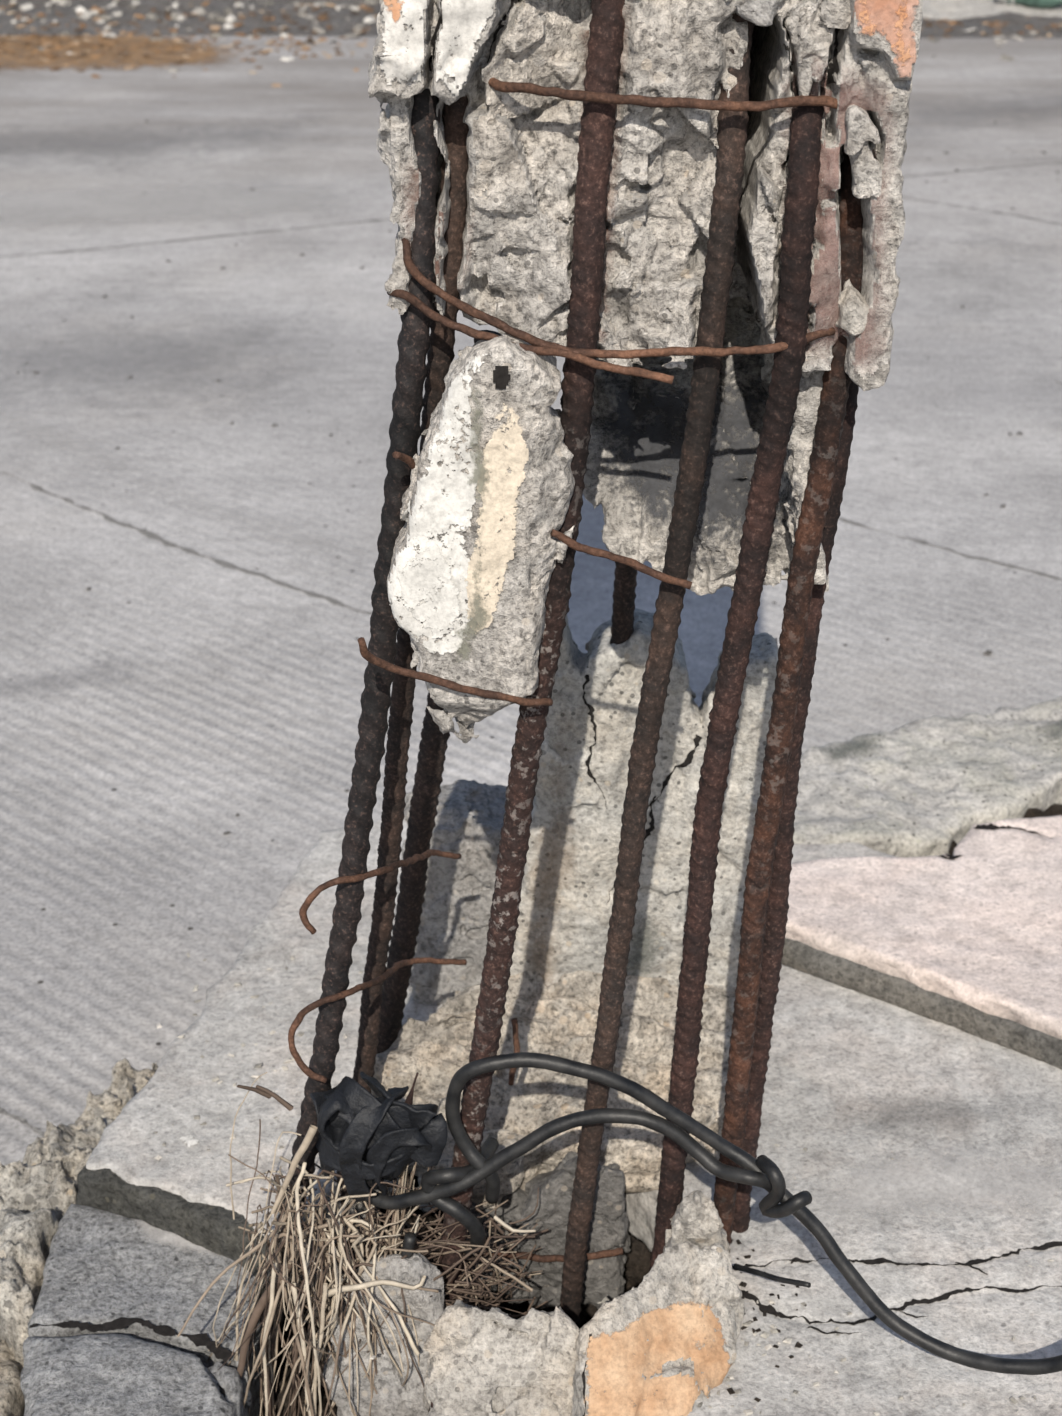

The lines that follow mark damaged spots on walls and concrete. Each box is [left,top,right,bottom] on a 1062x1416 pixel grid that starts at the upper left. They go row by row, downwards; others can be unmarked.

rust [434,211,445,287]
rust [809,80,870,354]
spalling [380,0,919,1167]
spalling [0,301,529,1367]
crack [582,674,607,808]
crack [644,735,702,841]
spalling [559,1123,604,1326]
spalling [649,1119,690,1272]
spalling [713,1153,753,1252]
crack [732,1241,1062,1335]
crack [29,1317,236,1401]
peeling [584,1300,732,1416]